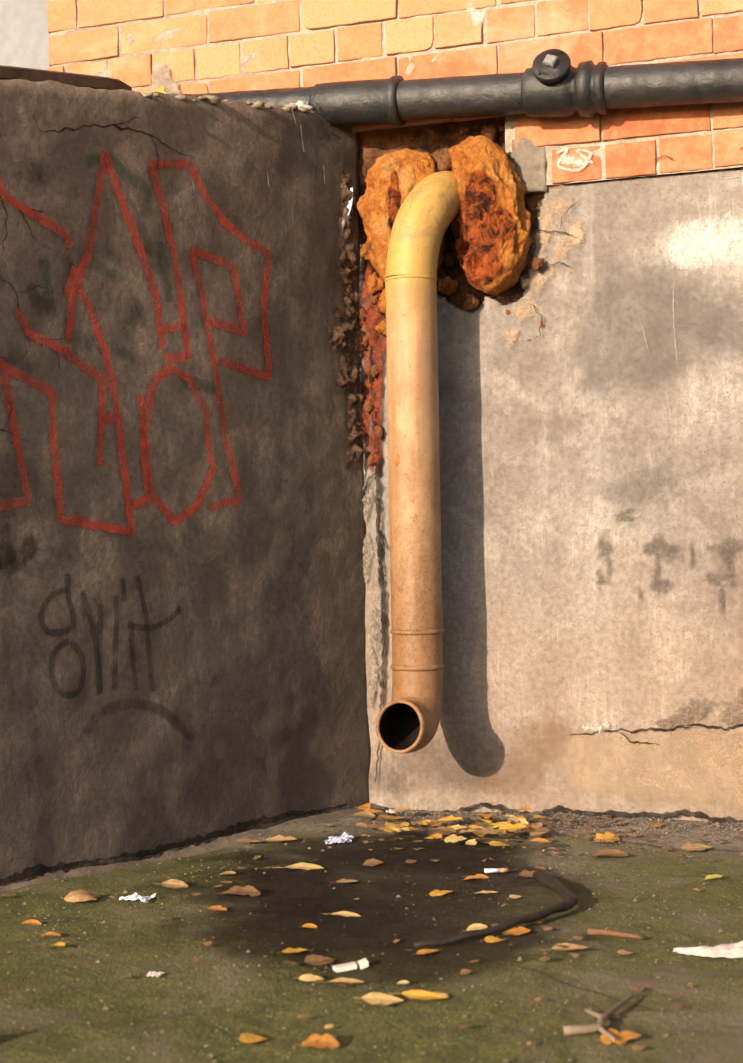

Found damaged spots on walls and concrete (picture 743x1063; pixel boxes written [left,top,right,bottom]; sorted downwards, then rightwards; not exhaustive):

crack [33,116,191,172]
rust [358,266,386,472]
crack [569,723,743,745]